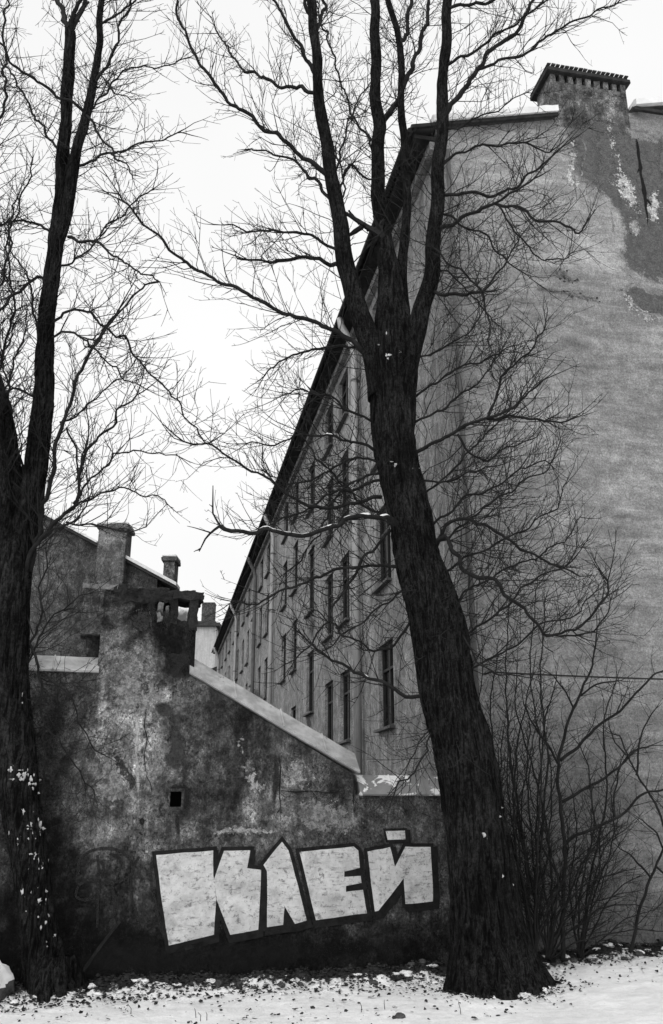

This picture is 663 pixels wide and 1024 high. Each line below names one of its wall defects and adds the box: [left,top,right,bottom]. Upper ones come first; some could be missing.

leakage [569,118,625,187]
spalling [562,117,663,322]
crack [636,139,652,225]